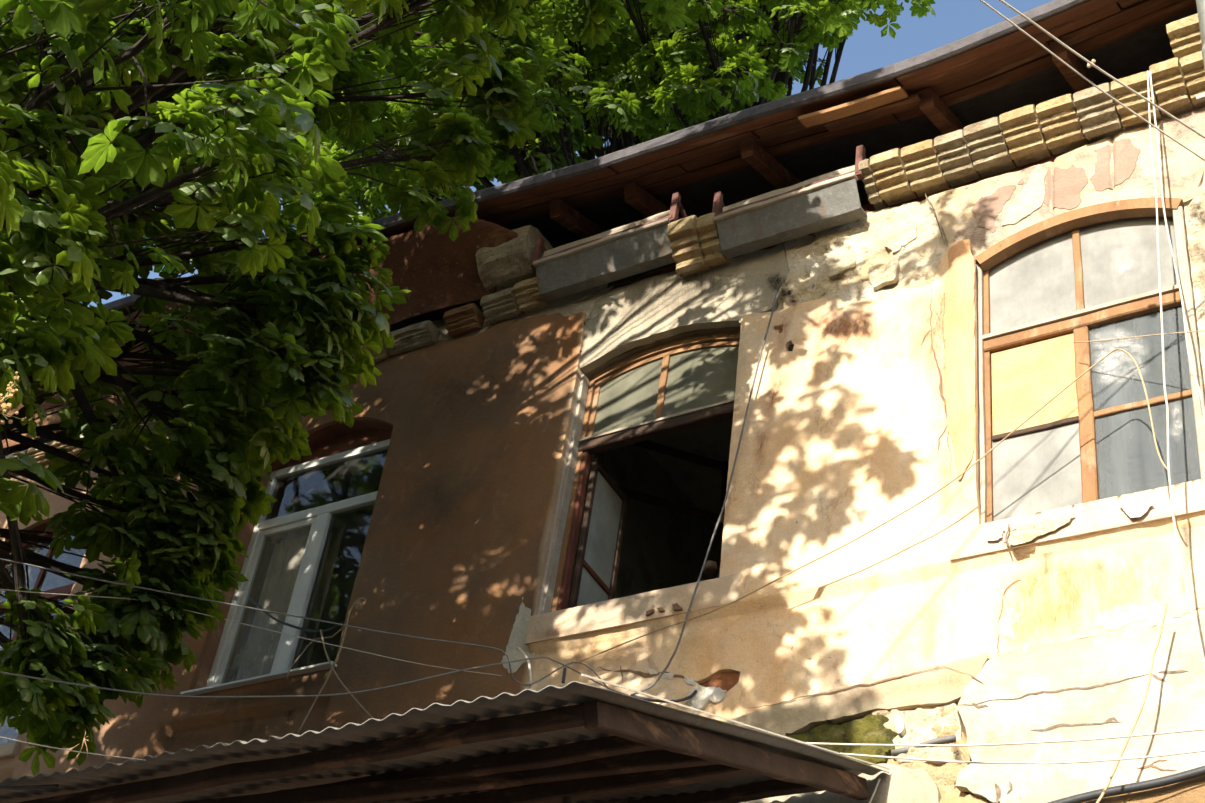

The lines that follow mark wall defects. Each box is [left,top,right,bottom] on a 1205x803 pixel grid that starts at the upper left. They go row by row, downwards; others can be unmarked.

flaking render [775,105,1205,379]
crack [921,286,952,471]
peeling [985,514,1075,545]
crack [997,580,1021,653]
peeling [1093,526,1205,645]
flaking render [685,672,740,715]
flaking render [872,702,1026,803]
crack [747,666,1187,709]
crack [1034,717,1119,732]
crack [1138,759,1177,771]